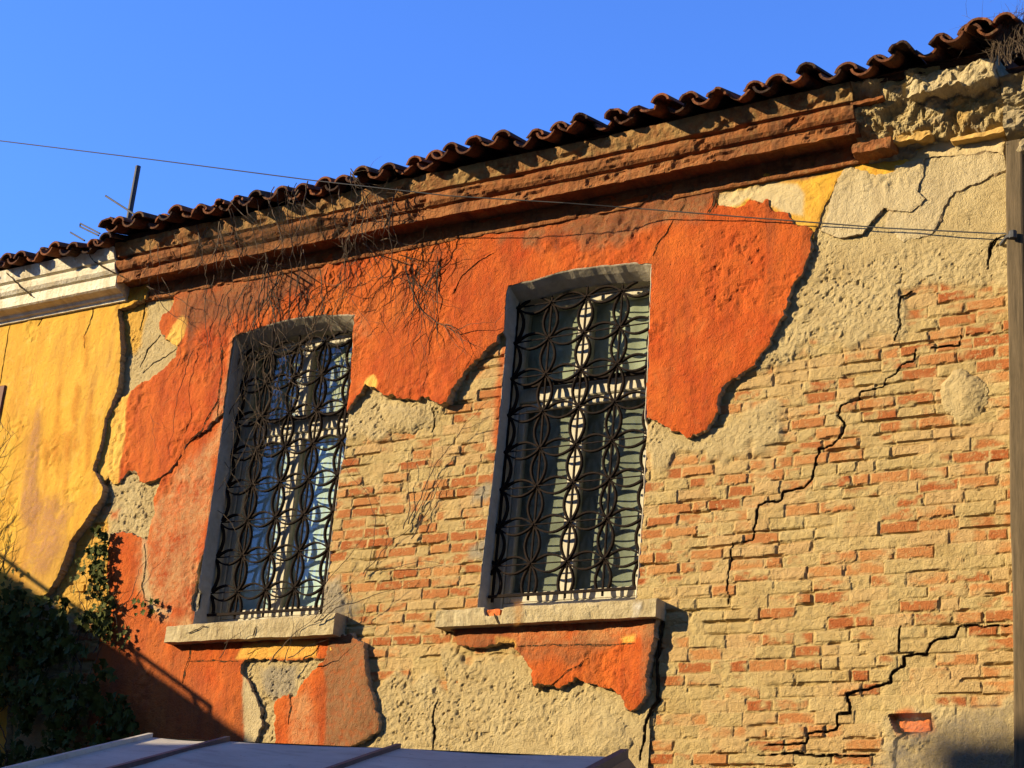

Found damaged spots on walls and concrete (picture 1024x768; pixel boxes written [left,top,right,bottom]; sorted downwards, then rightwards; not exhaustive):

crack [988,236,1005,269]
spalling [121,298,177,398]
spalling [322,138,1014,768]
crack [727,291,962,604]
spalling [244,658,325,743]
crack [768,624,1012,768]